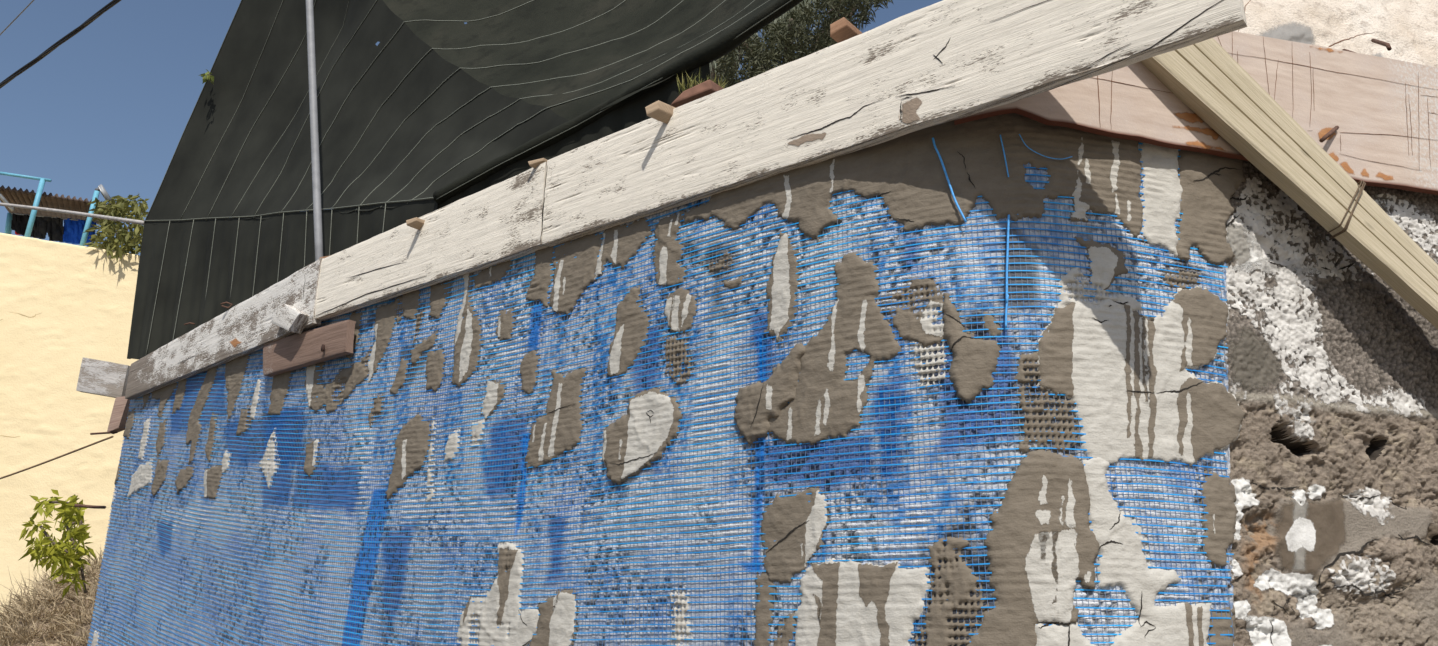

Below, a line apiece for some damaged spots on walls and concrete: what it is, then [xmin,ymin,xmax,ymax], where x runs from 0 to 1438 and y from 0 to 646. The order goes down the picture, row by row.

peeling [1372,193,1438,263]
peeling [1226,176,1427,460]
peeling [1231,478,1260,540]
peeling [1285,484,1326,552]
peeling [1343,486,1394,525]
peeling [1230,554,1396,646]